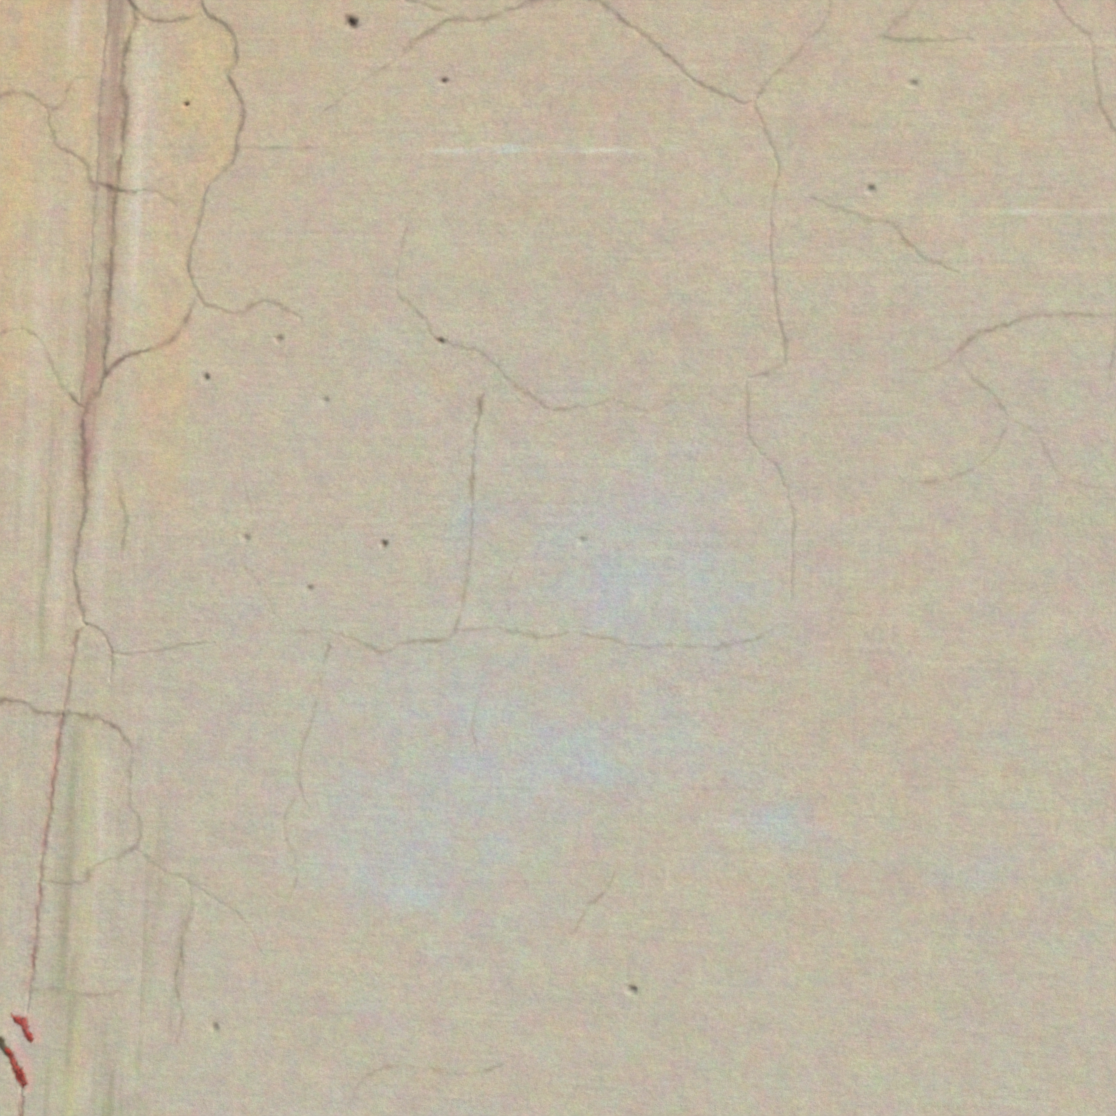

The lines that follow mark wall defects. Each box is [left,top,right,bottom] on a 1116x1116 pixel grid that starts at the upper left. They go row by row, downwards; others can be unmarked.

crack [873,0,973,52]
crack [1049,0,1116,139]
crack [806,194,962,275]
crack [899,304,1116,491]
crack [0,0,838,1050]
crack [10,1087,28,1116]